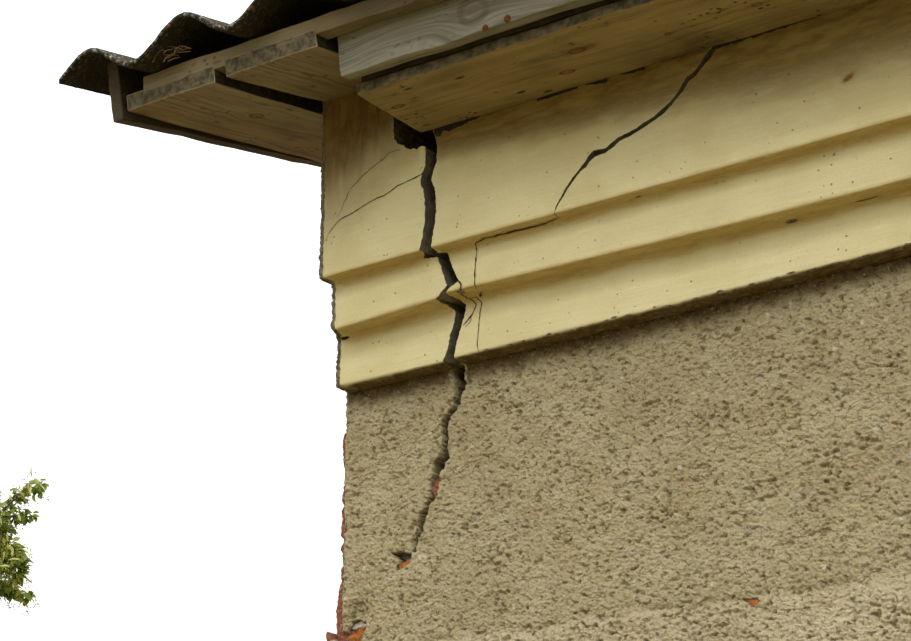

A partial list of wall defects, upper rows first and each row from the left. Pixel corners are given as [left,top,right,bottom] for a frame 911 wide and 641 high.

crack [325,48,715,369]
spalling [318,103,366,641]
spalling [399,554,412,570]
crack [432,478,441,499]